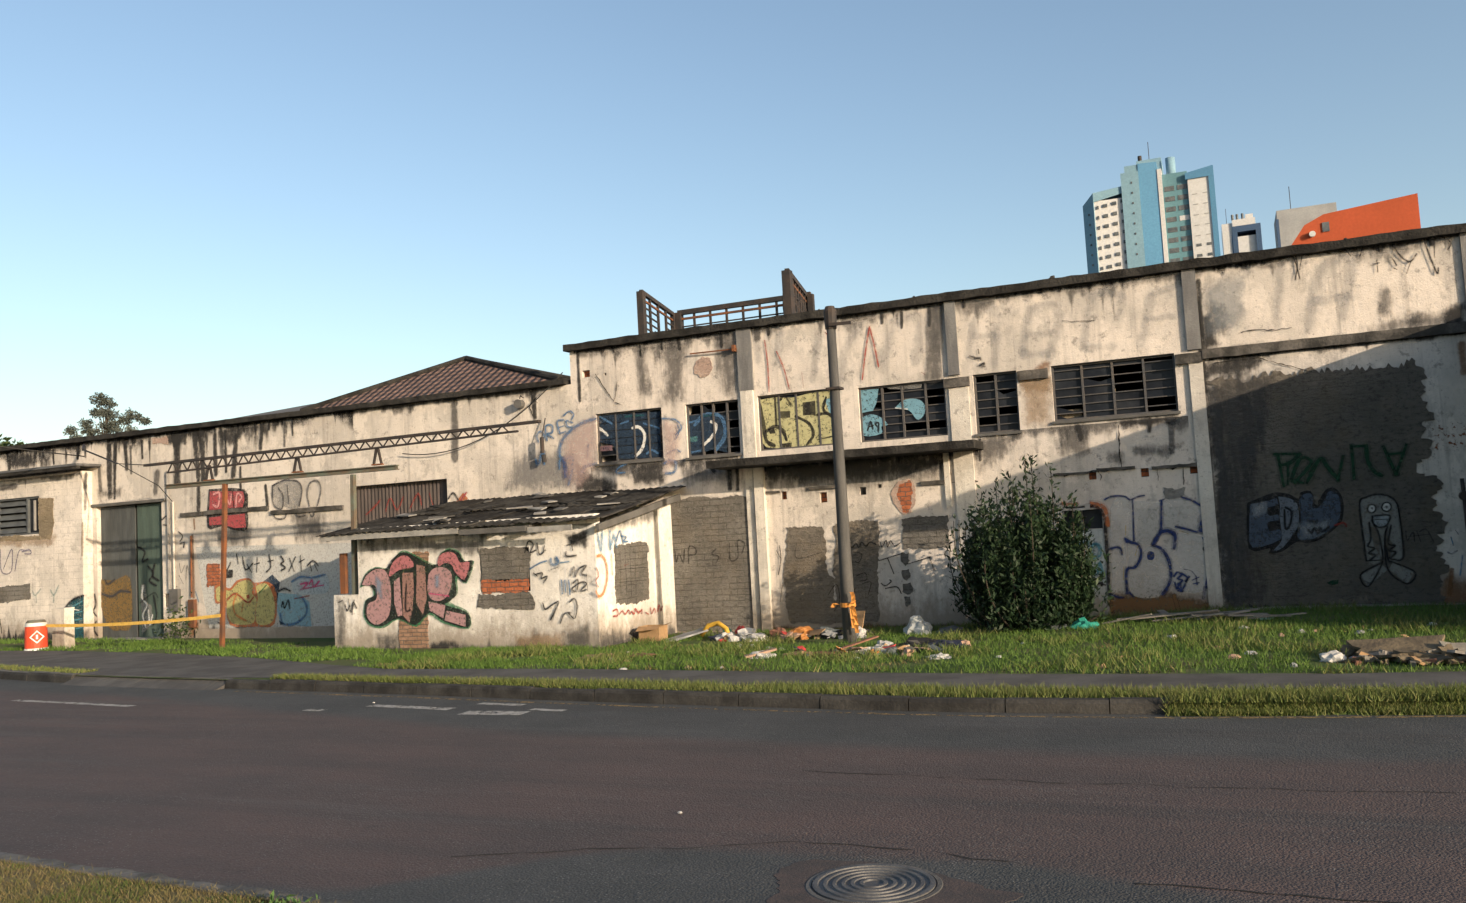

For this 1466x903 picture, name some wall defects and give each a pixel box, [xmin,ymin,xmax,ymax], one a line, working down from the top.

damp [0,234,1466,608]
damp [568,628,638,647]